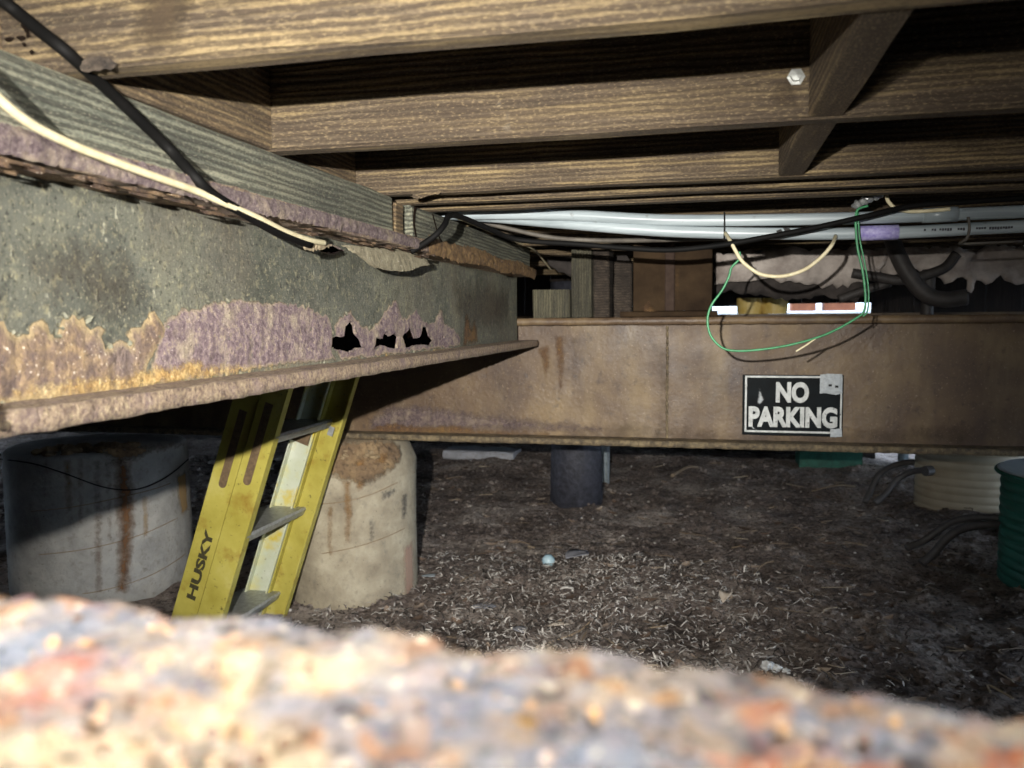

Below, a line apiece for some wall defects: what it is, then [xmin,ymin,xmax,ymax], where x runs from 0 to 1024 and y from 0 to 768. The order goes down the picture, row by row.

corrosion [14,362,273,398]
corrosion [116,462,146,590]